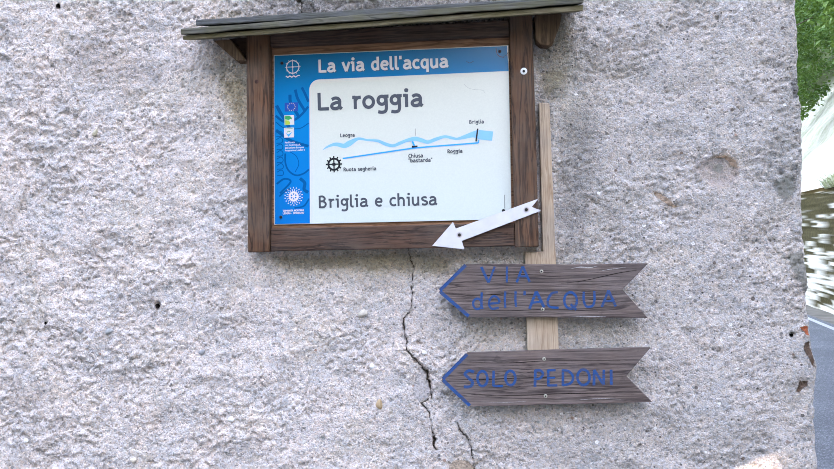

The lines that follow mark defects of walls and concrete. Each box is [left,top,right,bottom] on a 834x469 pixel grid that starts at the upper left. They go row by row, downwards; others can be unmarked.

crack [403,249,437,450]